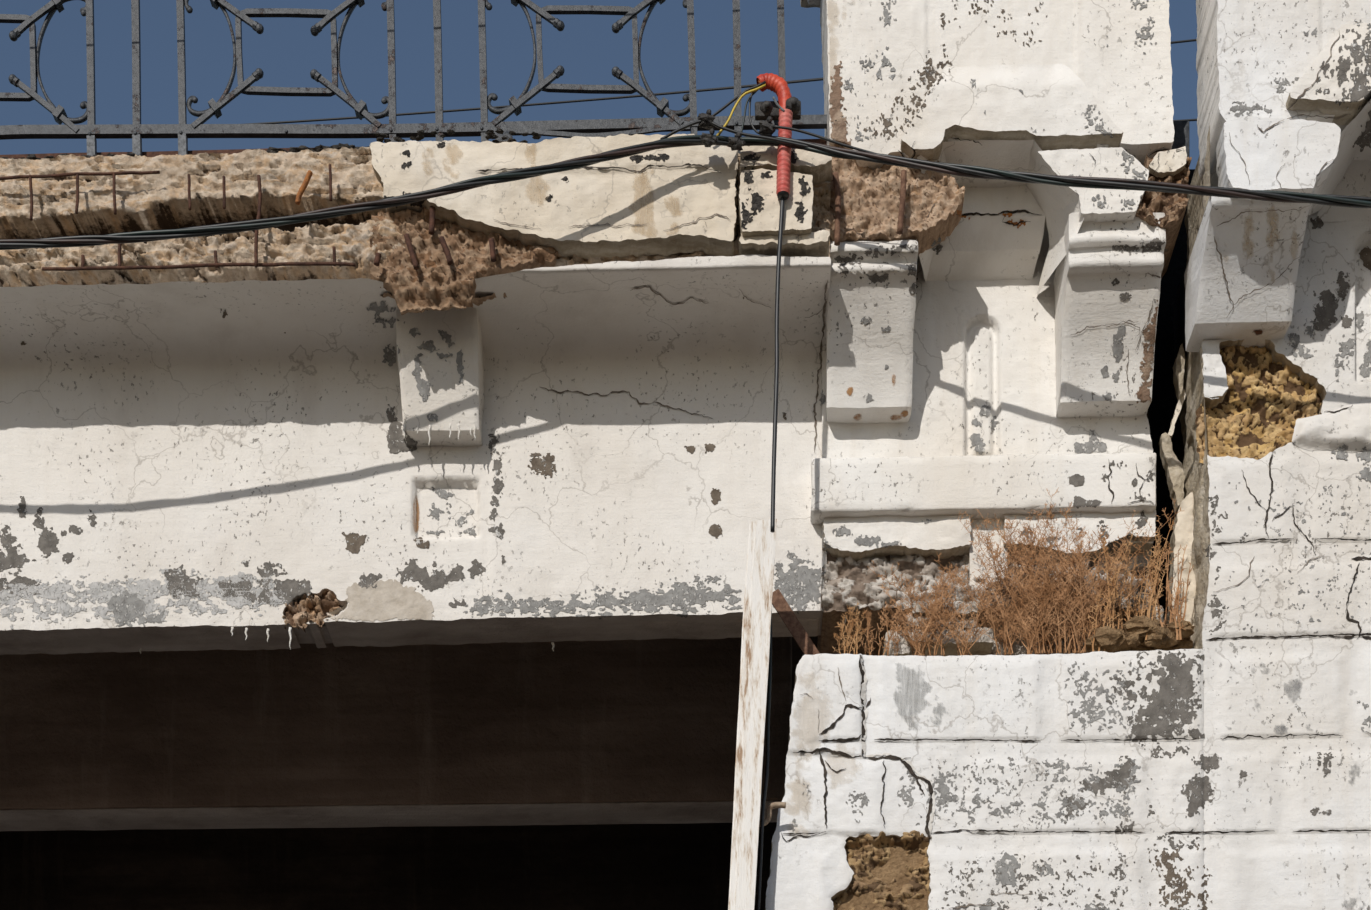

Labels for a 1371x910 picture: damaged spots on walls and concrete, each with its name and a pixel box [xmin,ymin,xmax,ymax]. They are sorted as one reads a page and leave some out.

spalling [0,147,709,422]
crack [541,387,710,418]
peeling [734,153,773,256]
spalling [790,0,1047,295]
peeling [1229,101,1272,117]
spalling [1195,271,1371,463]
peeling [1271,19,1371,152]
peeling [1359,246,1371,271]
crack [1207,453,1371,640]
peeling [833,649,1222,910]
crack [781,655,1371,842]
peeling [1316,752,1334,777]